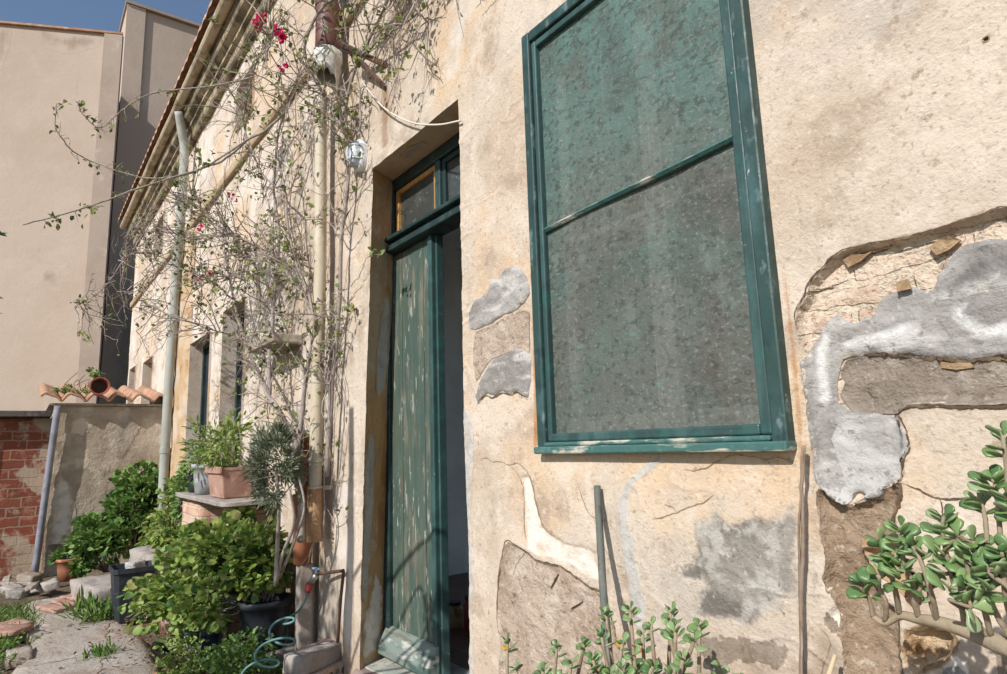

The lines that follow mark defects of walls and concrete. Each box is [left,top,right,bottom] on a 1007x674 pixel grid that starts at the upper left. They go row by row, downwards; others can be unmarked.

flaking render [473,311,530,381]
spalling [795,208,1007,417]
spalling [496,542,628,674]
spalling [815,460,975,674]